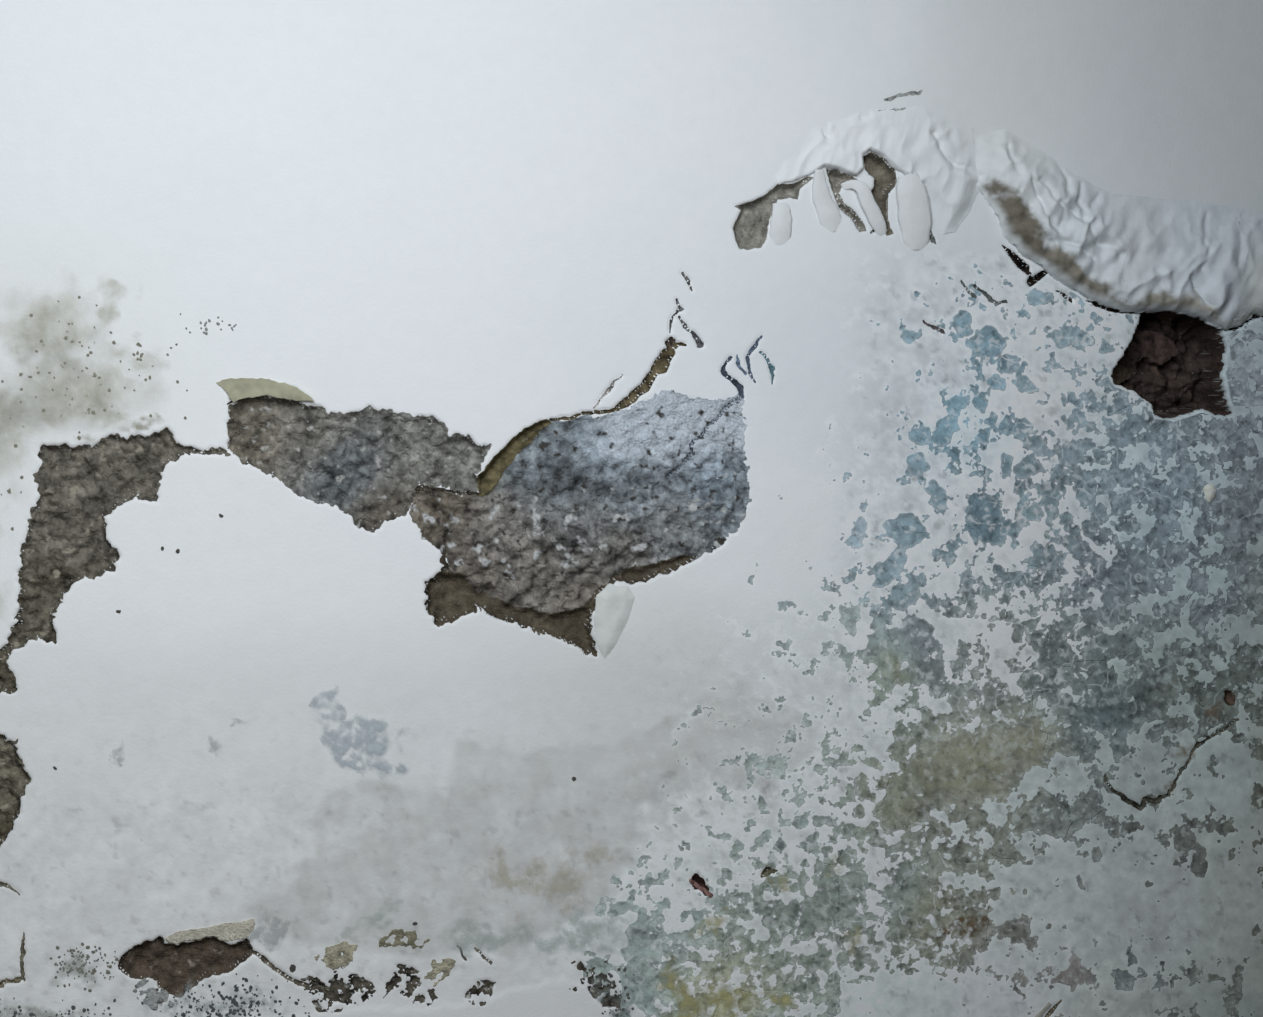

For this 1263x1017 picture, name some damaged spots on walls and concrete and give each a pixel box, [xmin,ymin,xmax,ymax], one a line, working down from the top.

flaking render [0,378,752,694]
peeling [569,264,1263,1017]
flaking render [0,734,32,846]
crack [1104,718,1239,811]
flaking render [0,977,26,988]
mould [0,942,119,1017]
flaking render [118,919,255,1012]
mould [168,964,310,1017]
flaking render [301,941,456,1012]
flaking render [379,929,430,948]
flaking render [465,980,496,1006]